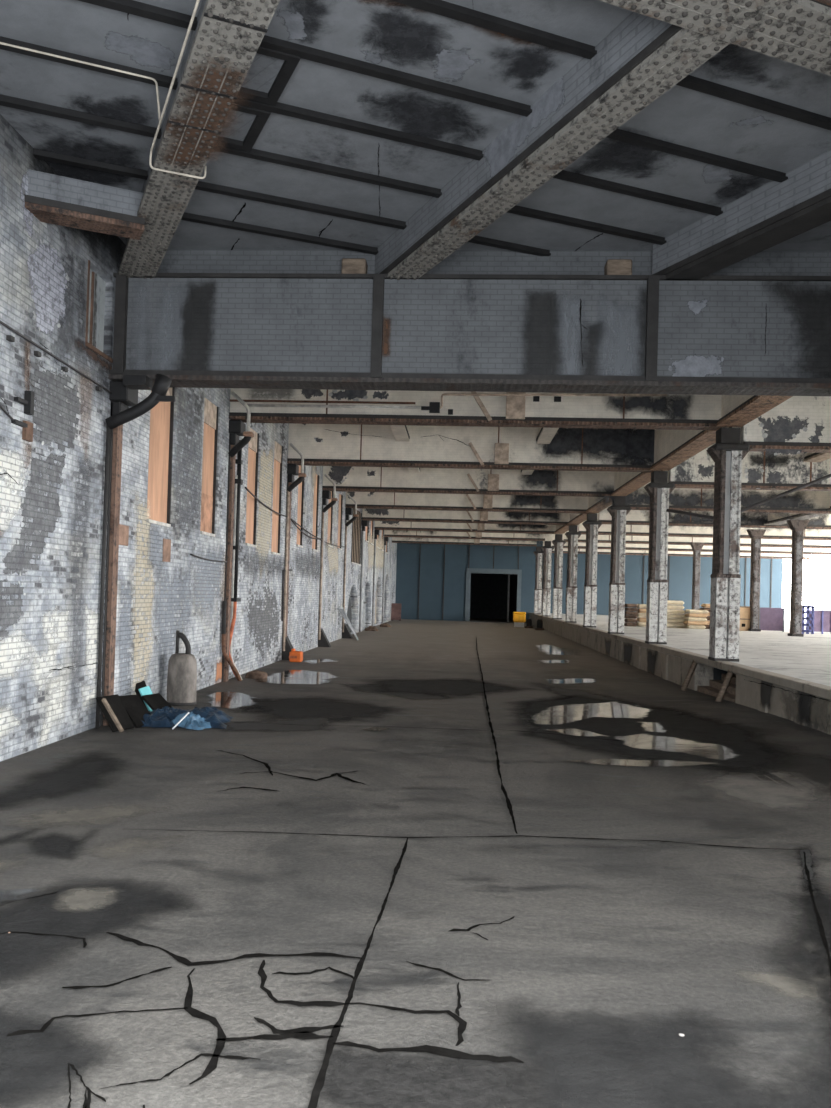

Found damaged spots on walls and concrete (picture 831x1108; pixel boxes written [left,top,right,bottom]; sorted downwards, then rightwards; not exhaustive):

damp [290,0,327,41]
damp [366,10,443,65]
damp [497,48,554,89]
damp [524,290,647,376]
peeling [301,389,389,401]
peeling [757,416,824,456]
peeling [0,354,84,640]
damp [516,681,831,792]
crack [449,916,515,940]
crack [0,932,524,1108]